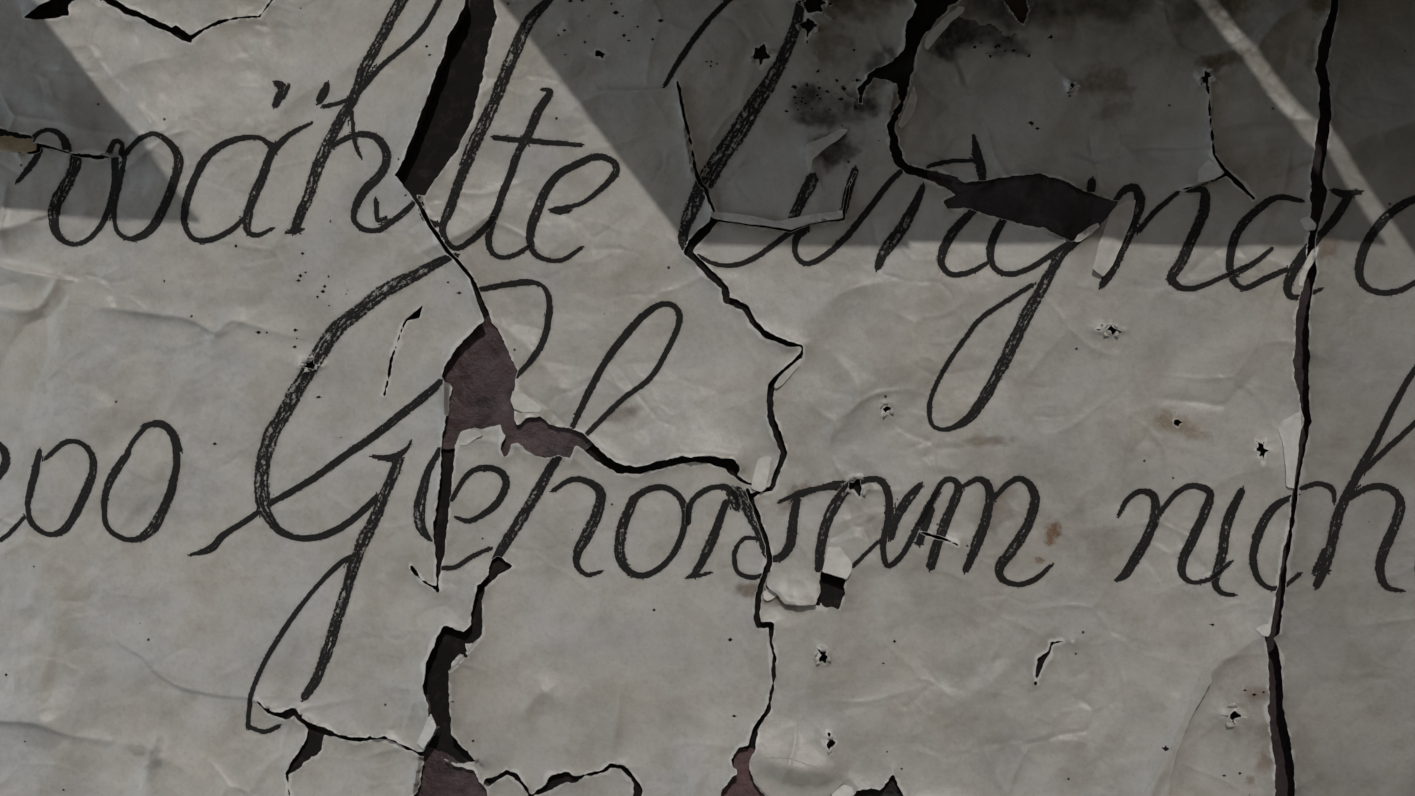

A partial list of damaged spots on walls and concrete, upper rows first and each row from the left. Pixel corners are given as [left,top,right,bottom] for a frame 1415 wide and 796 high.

peeling [1004,0,1029,24]
spalling [785,69,861,112]
crack [857,0,958,180]
peeling [927,171,1119,241]
peeling [441,315,594,458]
crack [585,81,857,767]
crack [1265,0,1338,796]
crack [921,532,958,546]
peeling [288,735,634,796]
peeling [721,748,765,796]
peeling [855,775,903,796]